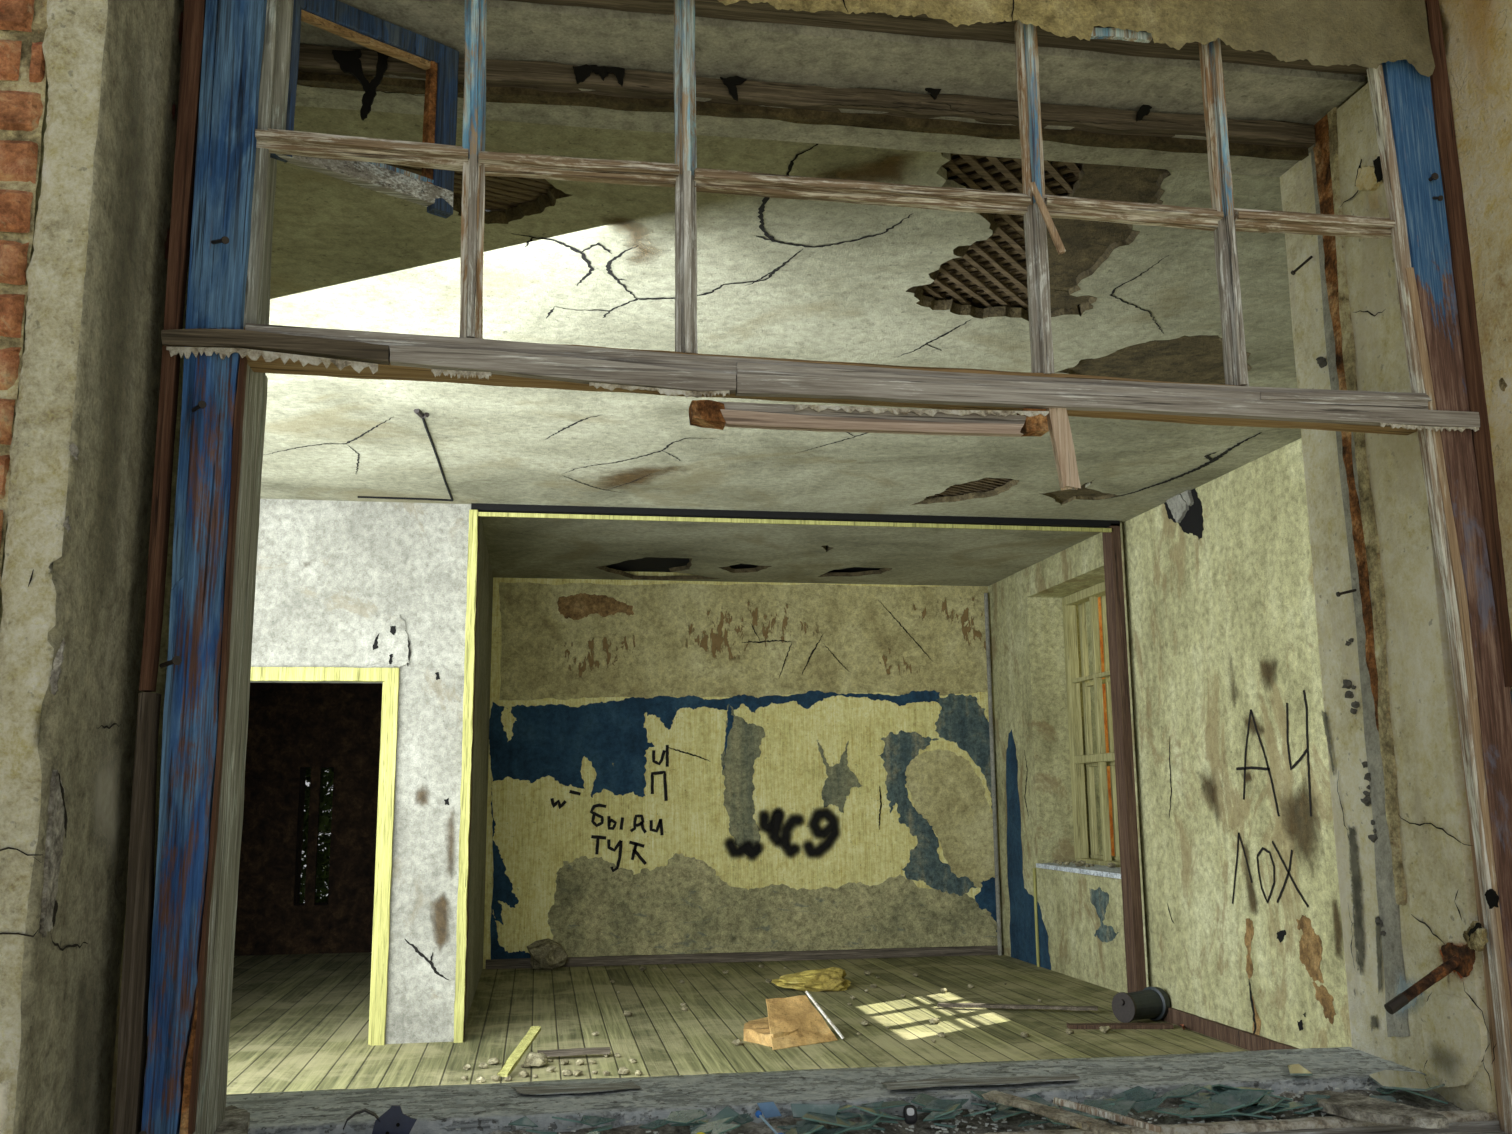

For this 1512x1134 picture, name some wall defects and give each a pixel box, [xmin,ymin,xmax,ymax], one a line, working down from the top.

crack [826,103,1147,125]
crack [512,143,912,319]
flaking render [489,582,1051,970]